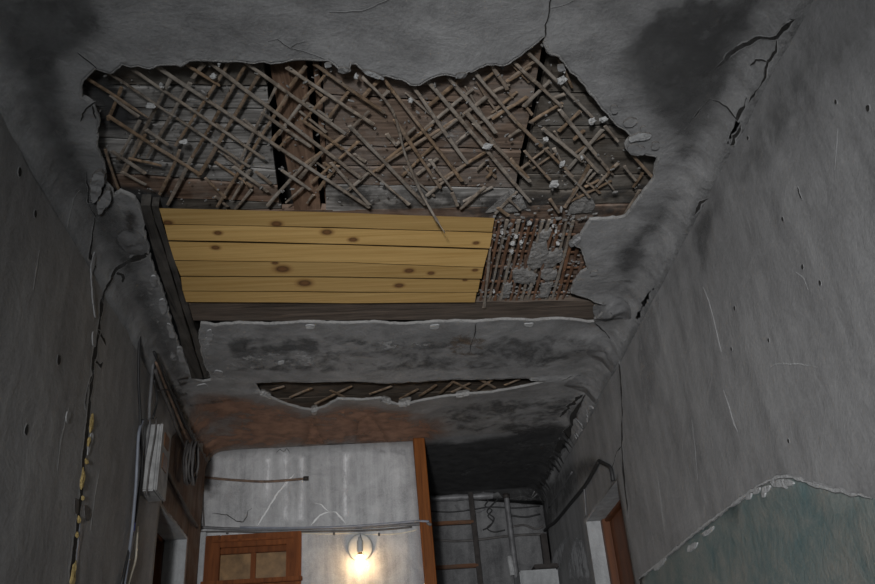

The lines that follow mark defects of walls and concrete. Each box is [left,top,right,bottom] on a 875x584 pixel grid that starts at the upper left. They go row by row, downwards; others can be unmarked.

crack [80,101,96,122]
crack [684,18,796,146]
flaking render [79,36,660,390]
crack [68,171,149,584]
flaking render [254,378,544,415]